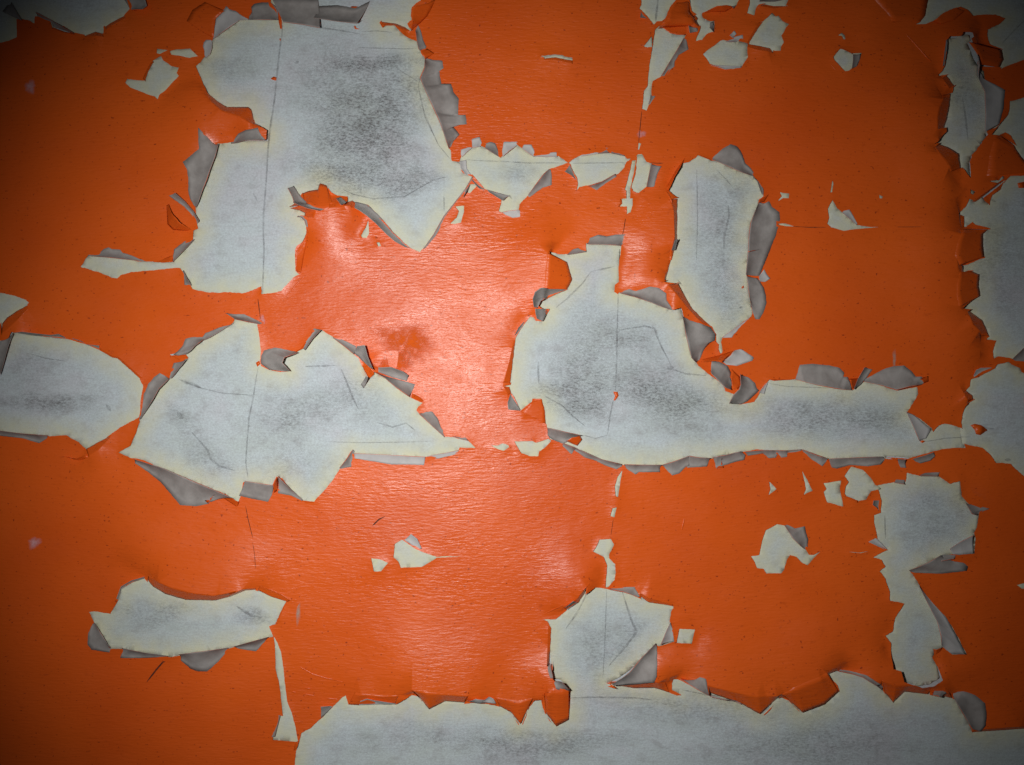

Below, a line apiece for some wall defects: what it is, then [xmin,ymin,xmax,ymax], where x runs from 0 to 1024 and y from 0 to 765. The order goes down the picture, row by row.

peeling [0,0,147,43]
peeling [81,0,662,294]
peeling [640,0,789,110]
peeling [875,0,1024,361]
peeling [0,293,475,507]
peeling [88,144,1024,765]